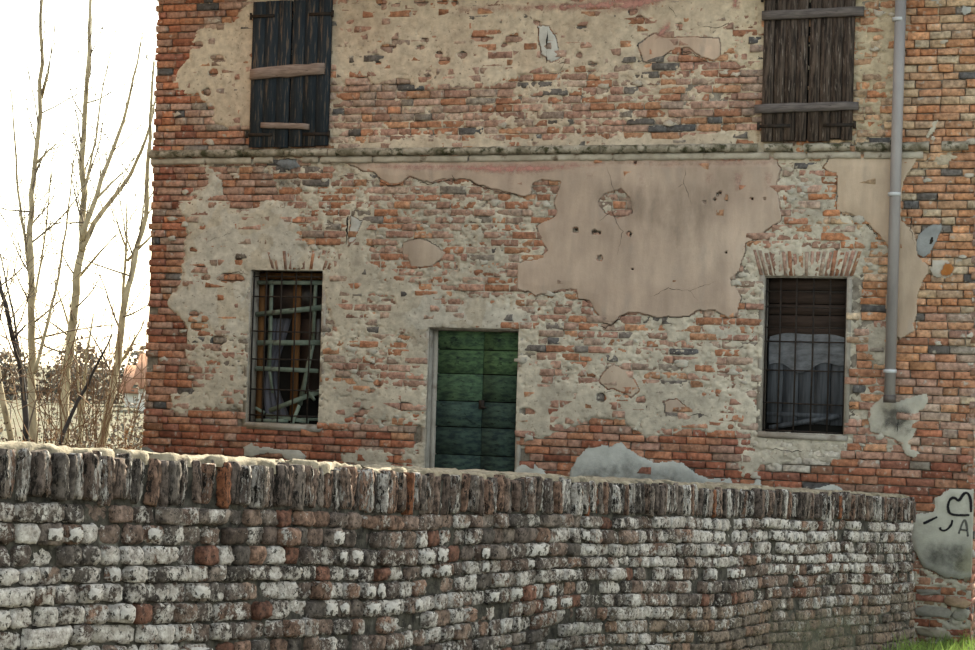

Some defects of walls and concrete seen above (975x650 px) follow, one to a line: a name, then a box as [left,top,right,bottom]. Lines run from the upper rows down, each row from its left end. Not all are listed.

peeling [142,0,975,522]